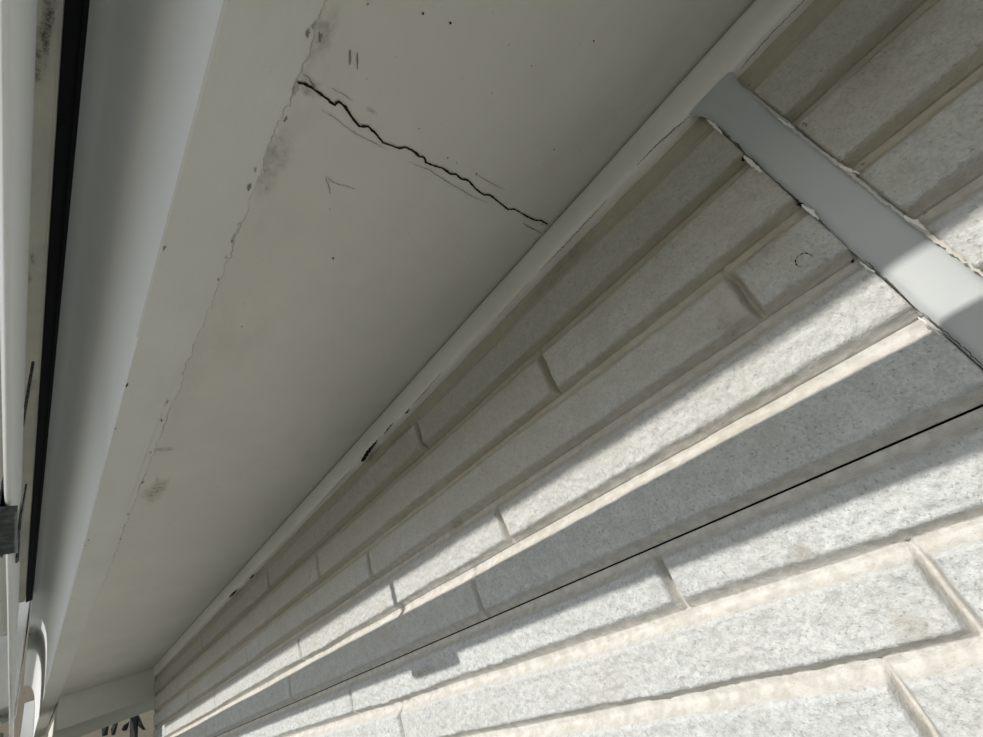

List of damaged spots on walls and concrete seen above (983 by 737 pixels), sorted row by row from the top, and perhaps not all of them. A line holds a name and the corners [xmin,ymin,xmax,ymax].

crack [297,74,548,233]